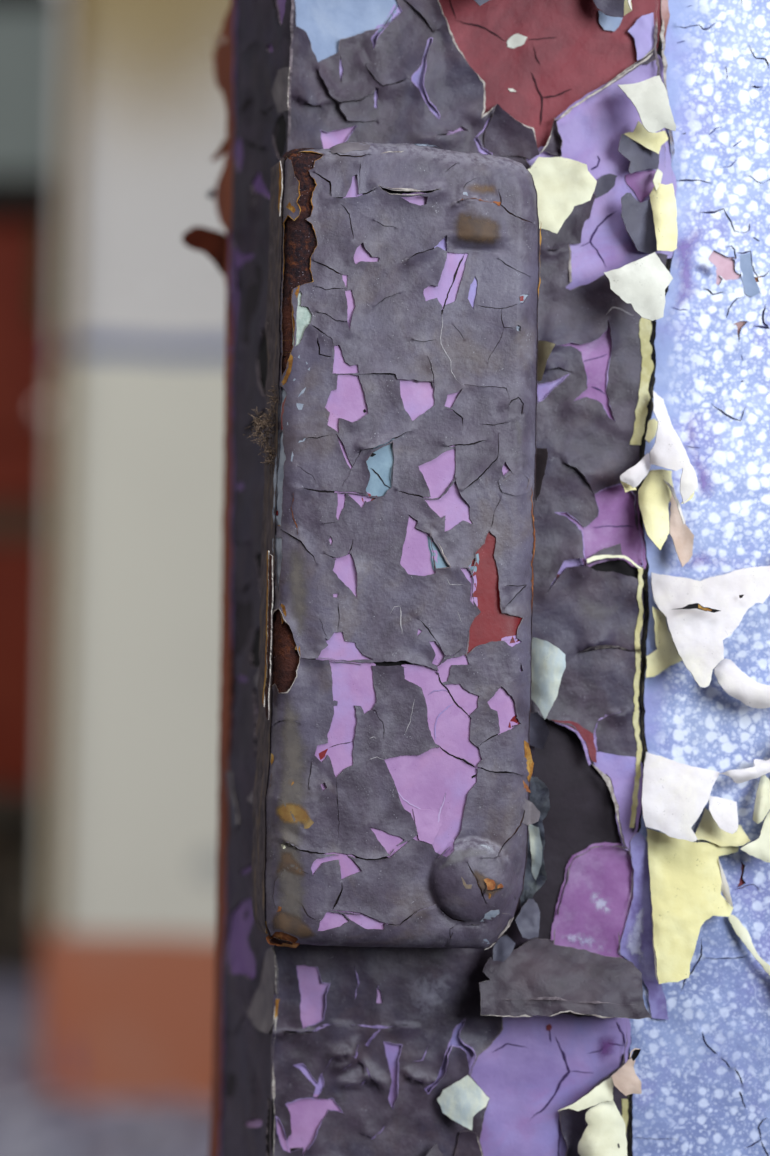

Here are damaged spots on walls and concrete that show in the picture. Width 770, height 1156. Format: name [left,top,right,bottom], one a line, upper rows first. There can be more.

peeling [277,0,402,79]
crack [654,0,715,99]
peeling [438,0,678,420]
crack [701,209,768,277]
crack [630,255,769,528]
peeling [550,390,770,709]
crack [581,559,649,832]
peeling [424,637,770,1156]
peeling [296,965,330,1028]
peeling [246,1063,343,1156]
crack [622,1094,671,1156]
crack [702,1034,768,1156]